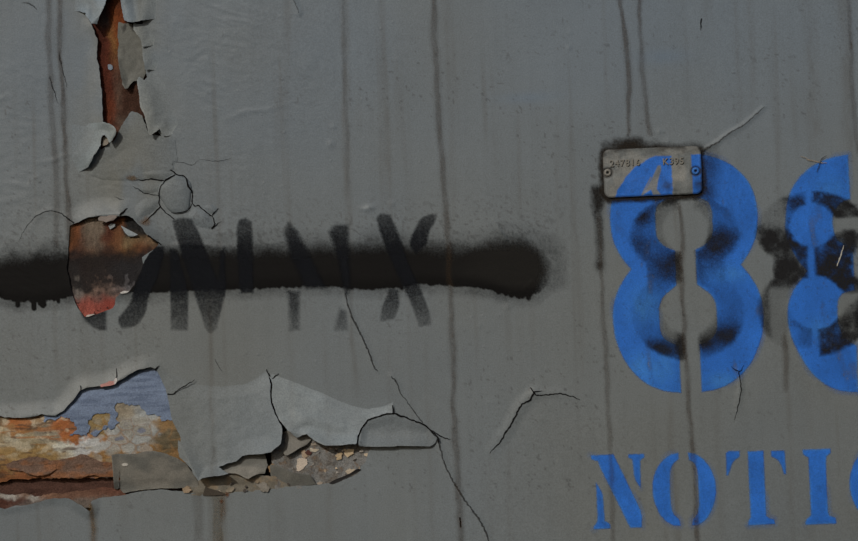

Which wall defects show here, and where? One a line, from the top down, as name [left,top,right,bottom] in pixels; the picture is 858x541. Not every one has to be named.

peeling [71,0,178,181]
corrosion [19,208,161,317]
corrosion [0,366,450,531]
crack [345,293,489,541]
crack [490,387,580,453]